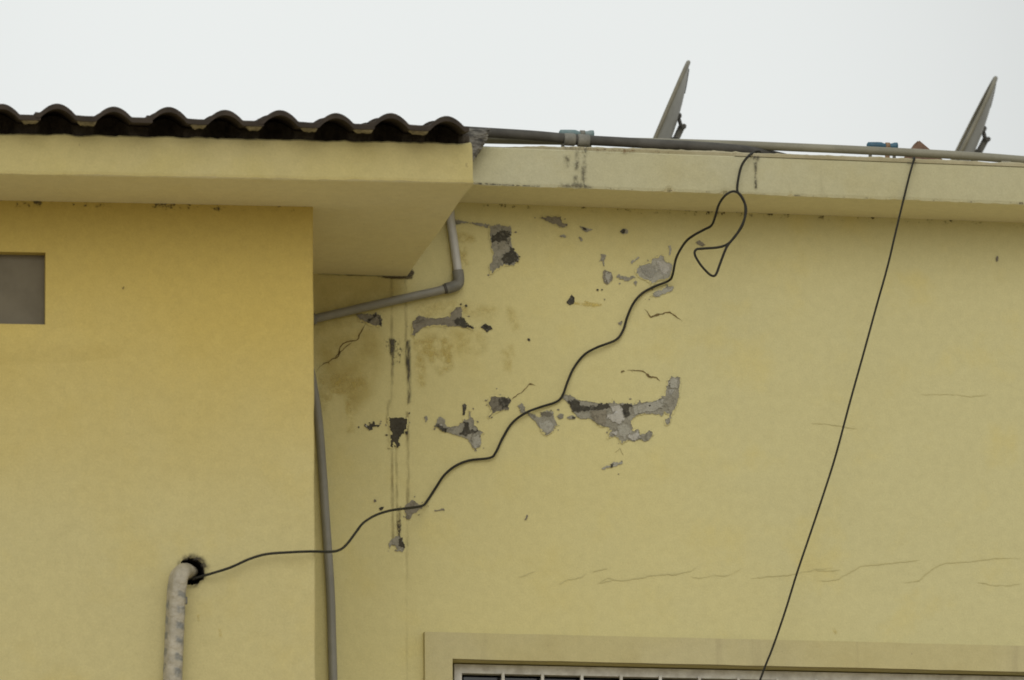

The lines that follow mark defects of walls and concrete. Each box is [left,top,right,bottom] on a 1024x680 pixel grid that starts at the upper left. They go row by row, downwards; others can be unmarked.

peeling [446,219,521,276]
peeling [596,245,674,300]
peeling [407,304,492,339]
crack [318,325,365,369]
peeling [358,412,411,449]
peeling [424,374,682,451]
peeling [403,496,445,519]
peeling [389,533,405,552]
crack [560,558,1021,586]